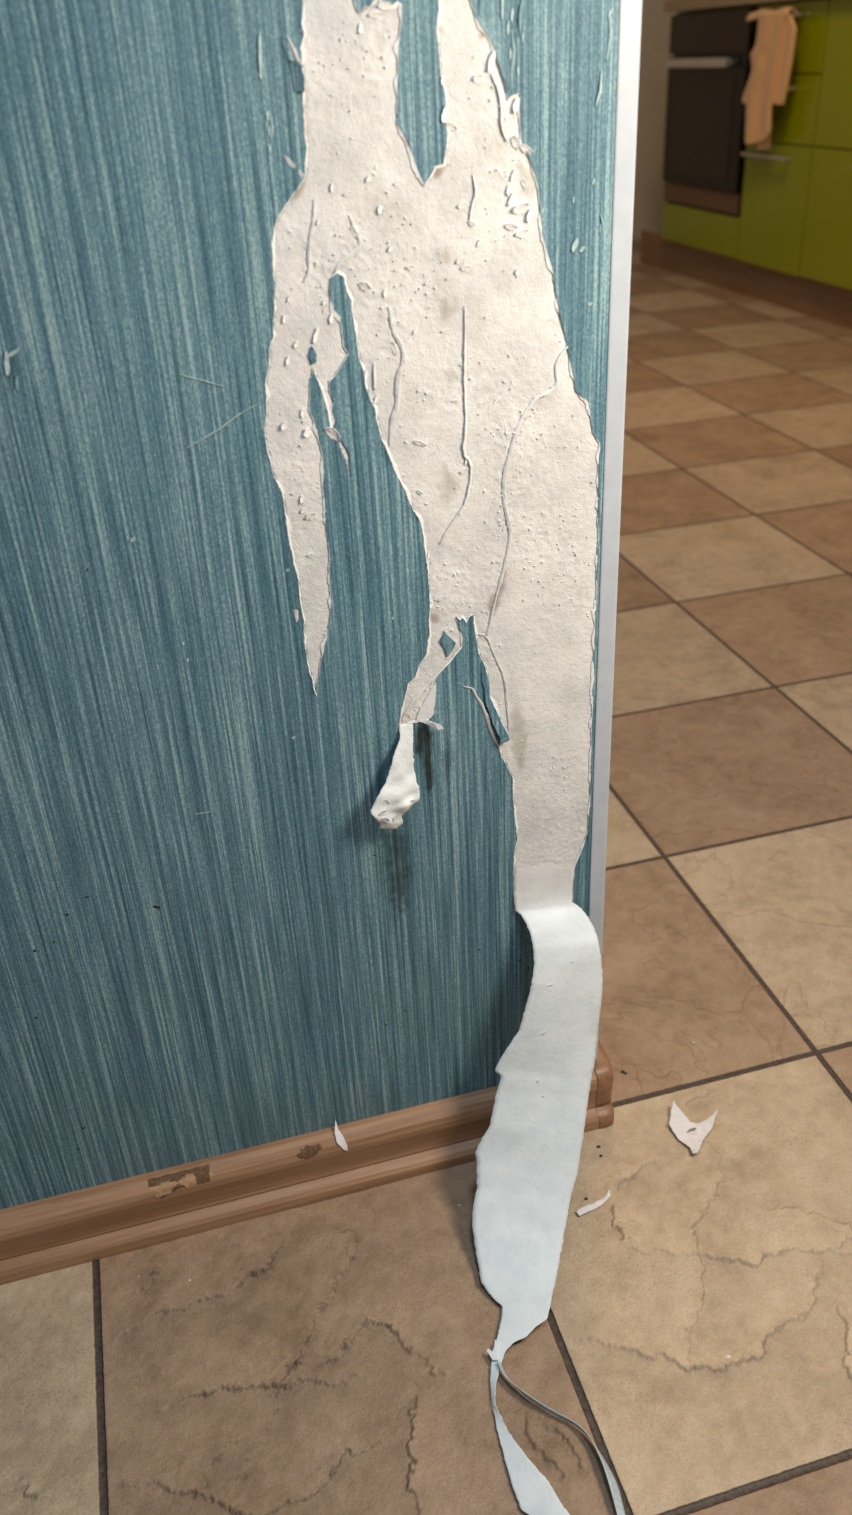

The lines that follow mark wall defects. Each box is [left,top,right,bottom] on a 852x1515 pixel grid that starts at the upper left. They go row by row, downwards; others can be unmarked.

peeling [264,0,600,901]